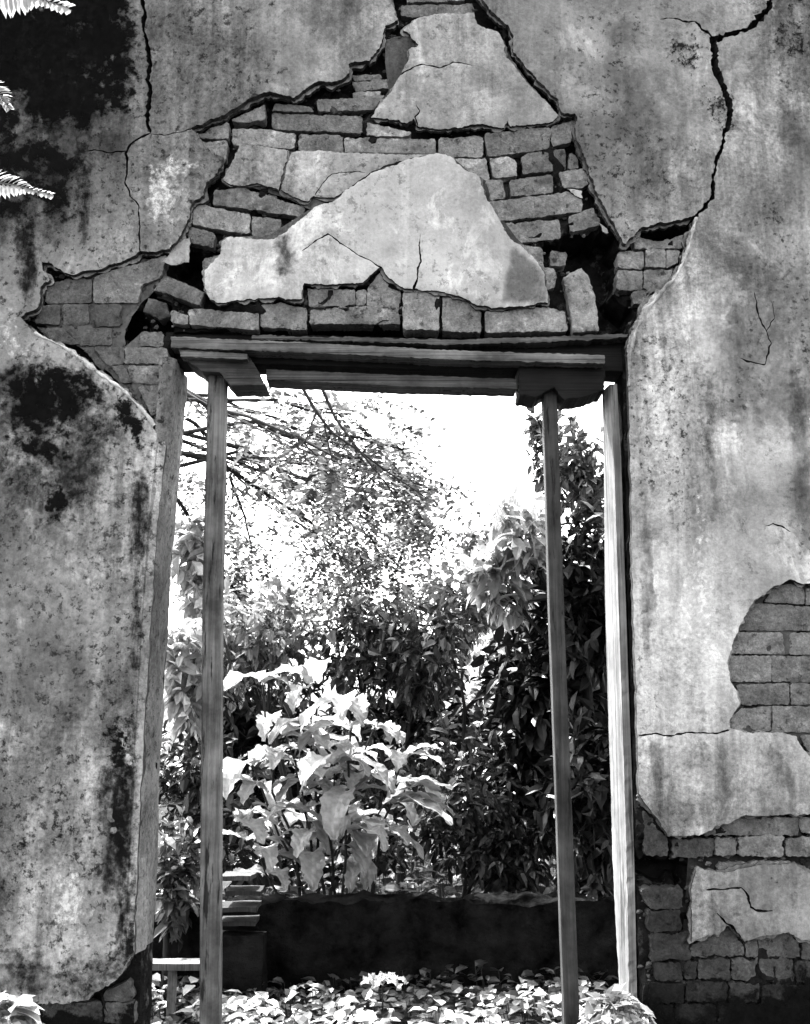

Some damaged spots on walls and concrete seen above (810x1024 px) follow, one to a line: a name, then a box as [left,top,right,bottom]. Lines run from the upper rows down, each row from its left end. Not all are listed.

water stain [0,0,140,300]
crack [85,0,193,254]
spalling [30,0,608,427]
crack [304,234,381,268]
crack [413,241,422,292]
spalling [612,217,698,386]
crack [665,0,772,222]
water stain [0,356,149,522]
water stain [129,470,152,669]
spalling [729,581,810,753]
spalling [636,802,810,1024]
crack [707,887,772,938]